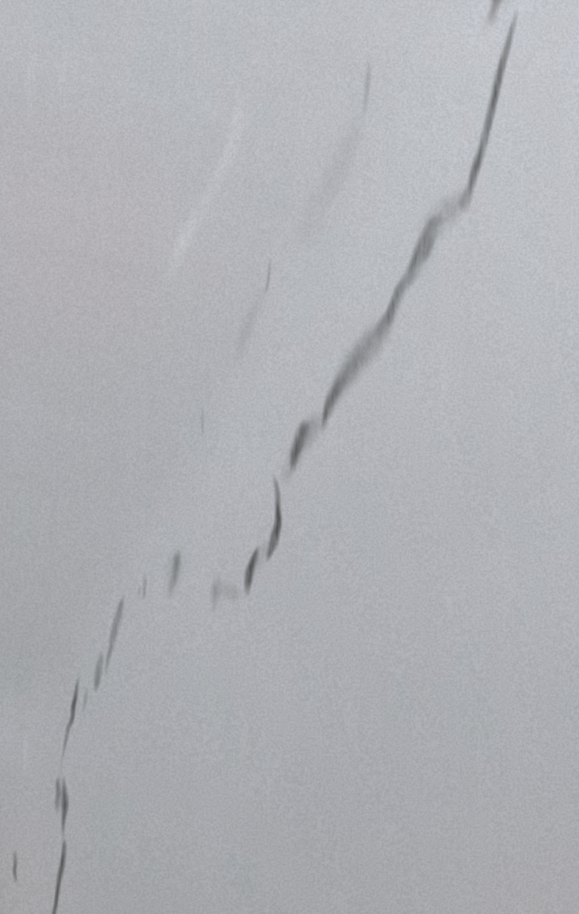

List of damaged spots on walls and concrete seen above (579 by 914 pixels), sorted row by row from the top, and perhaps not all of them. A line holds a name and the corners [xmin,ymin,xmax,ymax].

crack [487,67,502,128]
crack [471,149,481,184]
crack [247,503,280,584]
crack [56,854,64,904]